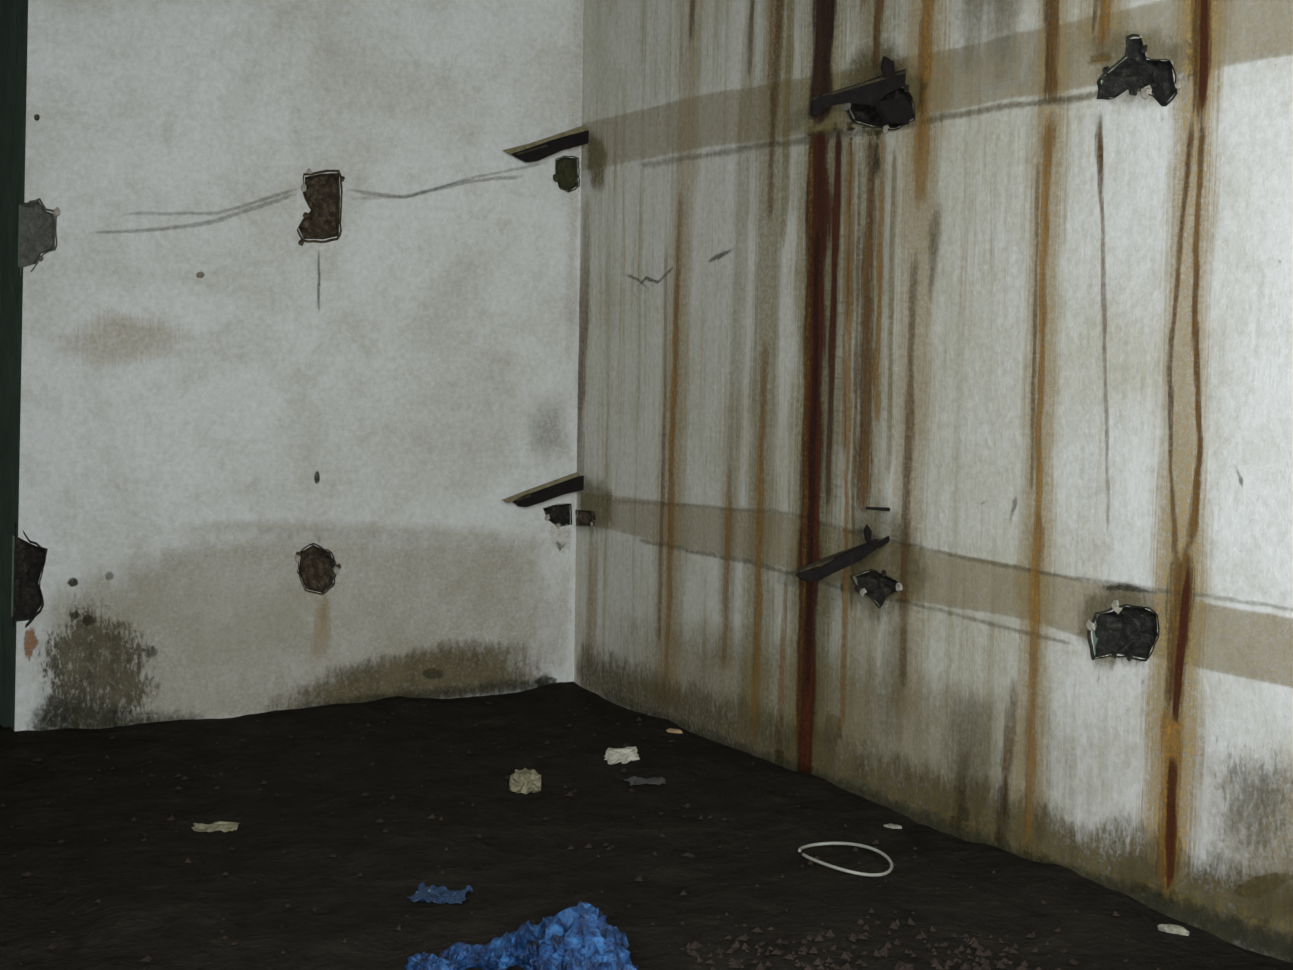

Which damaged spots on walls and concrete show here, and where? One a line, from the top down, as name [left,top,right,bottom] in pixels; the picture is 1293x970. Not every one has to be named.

spalling [297,168,345,305]
rust [1096,123,1104,220]
rust [769,0,894,774]
rust [999,0,1066,840]
rust [1141,0,1226,888]
spalling [13,523,48,660]
leakage [34,578,193,731]
spalling [294,543,341,595]
leakage [276,644,556,708]
leakage [1083,584,1149,637]
spalling [1086,600,1160,661]
leakage [578,643,1293,963]